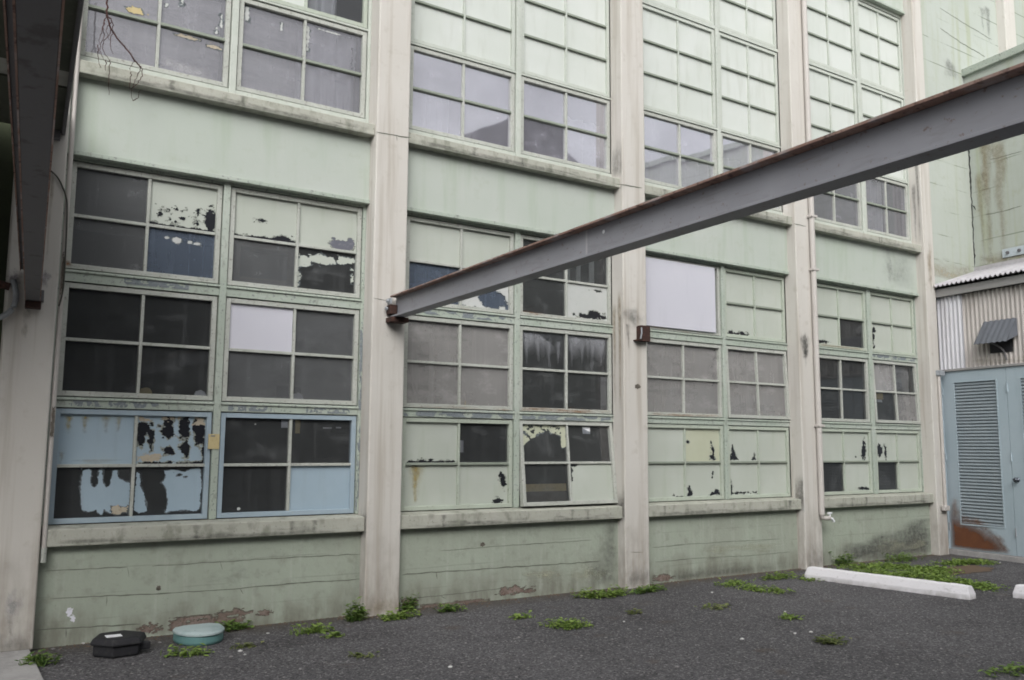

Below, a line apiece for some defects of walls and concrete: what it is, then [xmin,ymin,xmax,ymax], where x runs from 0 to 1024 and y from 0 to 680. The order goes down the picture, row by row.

peeling [149,203,216,247]
peeling [234,217,356,287]
peeling [425,287,512,322]
peeling [404,409,611,455]
peeling [71,400,206,516]
peeling [709,441,758,496]
rust [953,520,1000,551]
spalling [401,584,536,608]
spalling [136,607,274,634]